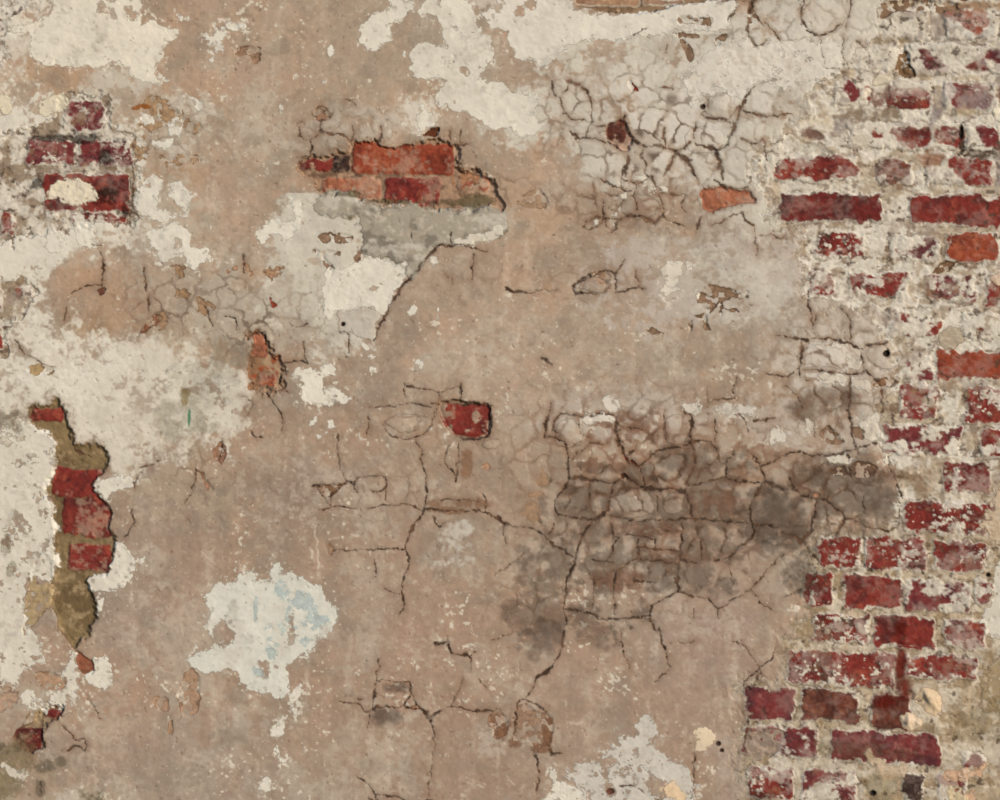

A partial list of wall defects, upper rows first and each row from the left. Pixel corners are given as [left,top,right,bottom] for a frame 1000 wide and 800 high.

peeling [205,21,262,64]
crack [727,4,780,46]
crack [801,0,870,69]
flaking render [0,0,216,316]
crack [551,80,791,255]
flaking render [0,275,39,359]
flaking render [247,0,1000,800]
damp [790,387,854,420]
crack [312,291,903,730]
peeling [0,398,146,754]
peeling [0,762,29,782]
crack [534,746,561,791]